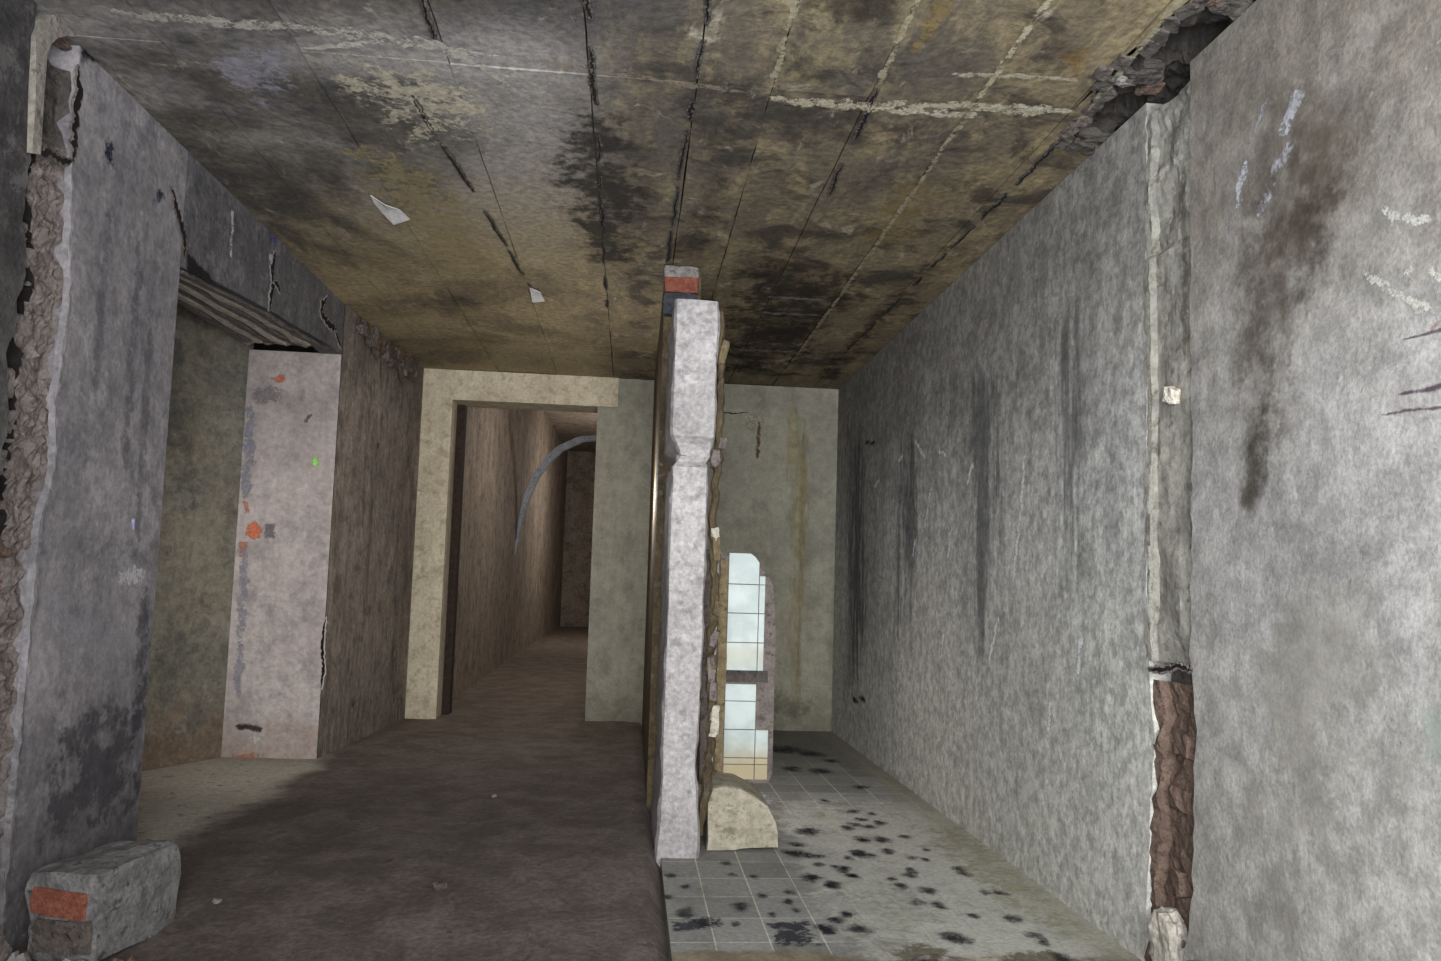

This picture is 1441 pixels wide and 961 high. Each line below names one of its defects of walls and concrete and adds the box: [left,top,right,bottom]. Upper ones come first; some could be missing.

crack [268,250,280,312]
crack [419,0,438,42]
crack [411,95,533,291]
crack [583,0,609,308]
crack [665,0,712,262]
crack [828,89,880,195]
crack [847,137,1063,350]
damp [770,0,1184,355]
spalling [1053,0,1256,156]
damp [1225,139,1296,246]
spalling [0,46,96,934]
spalling [1149,679,1197,949]